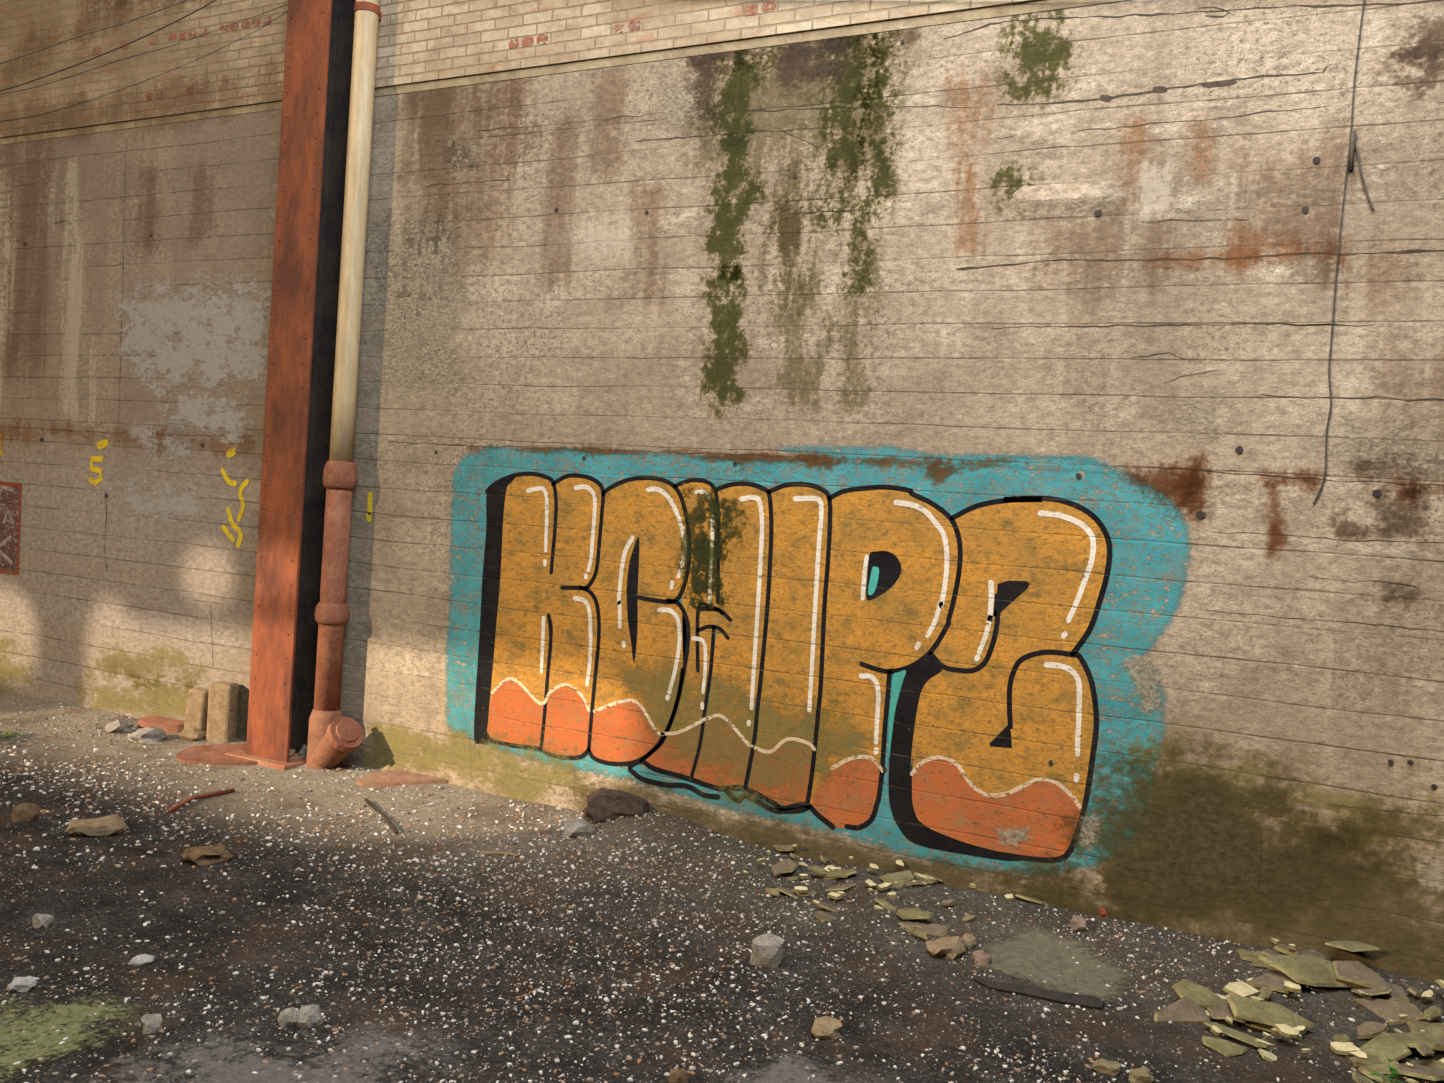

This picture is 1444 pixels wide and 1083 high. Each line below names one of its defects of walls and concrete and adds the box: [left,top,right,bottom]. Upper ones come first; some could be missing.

leakage [701,136,763,411]
leakage [824,141,893,292]